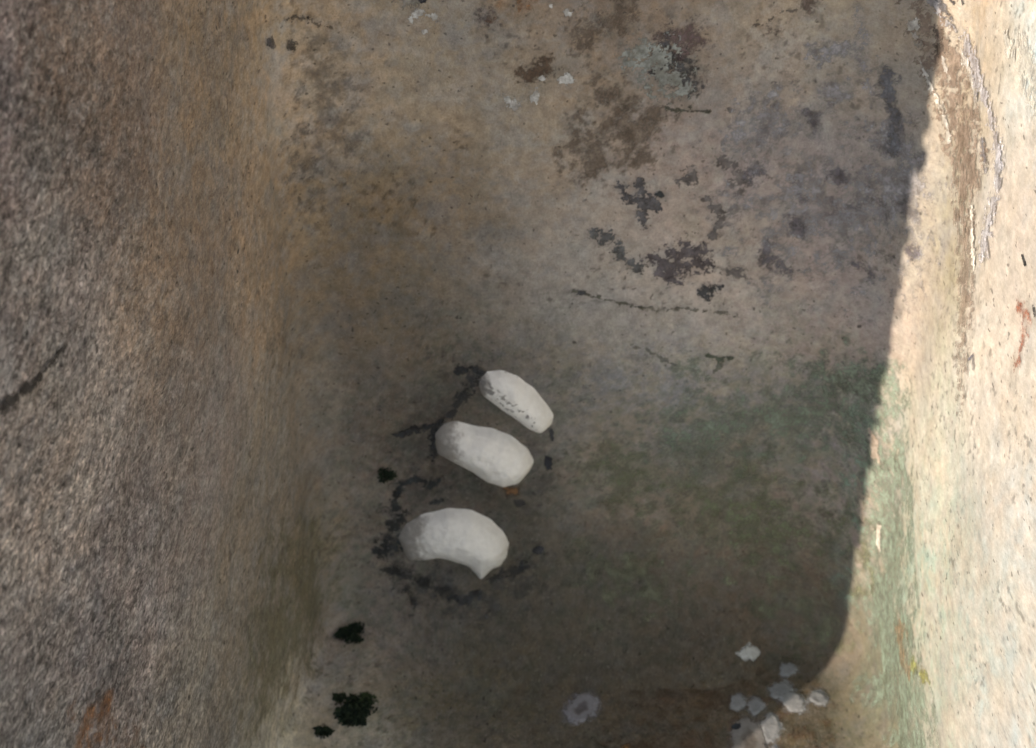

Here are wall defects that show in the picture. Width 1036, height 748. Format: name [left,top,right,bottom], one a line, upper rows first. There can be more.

water stain [564,0,640,56]
water stain [514,52,562,83]
water stain [554,19,707,187]
water stain [719,6,931,303]
crack [571,289,738,318]
corrosion [1014,300,1031,367]